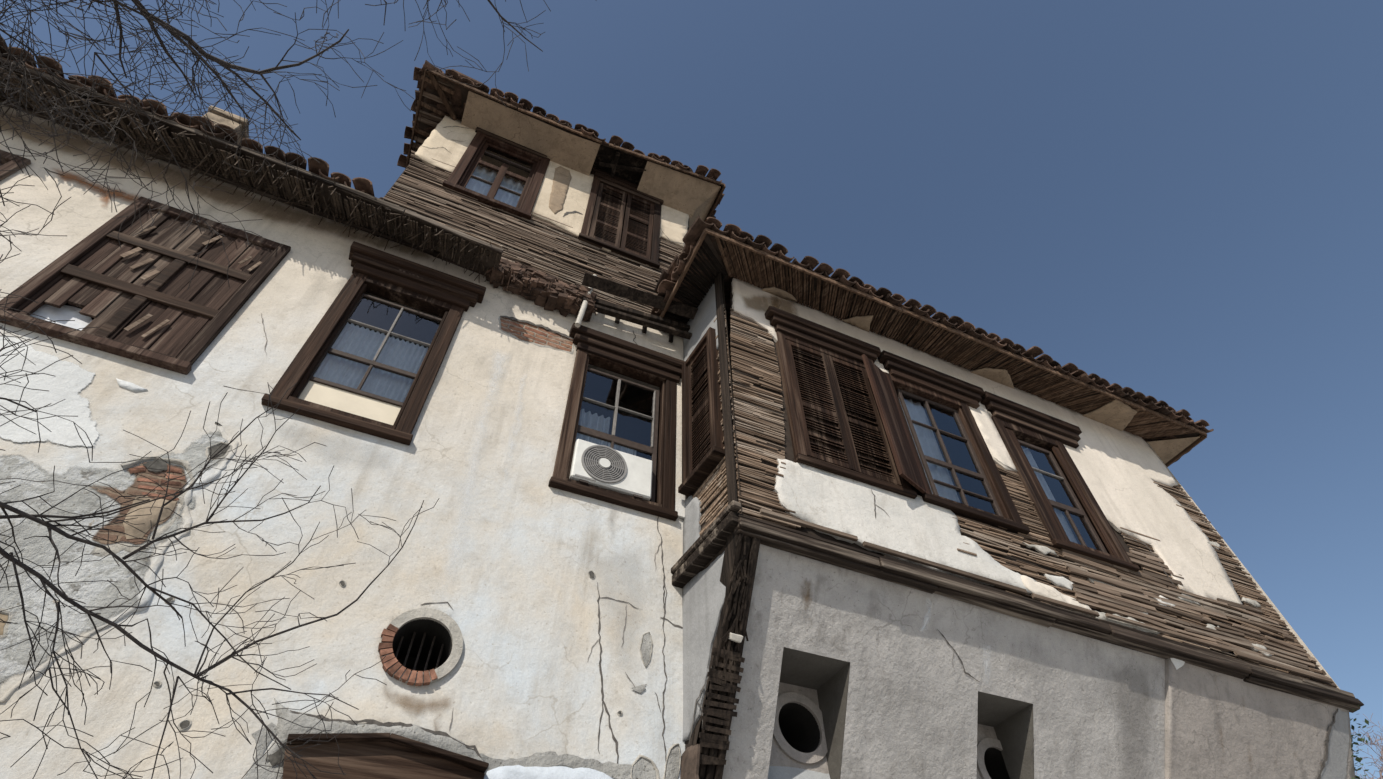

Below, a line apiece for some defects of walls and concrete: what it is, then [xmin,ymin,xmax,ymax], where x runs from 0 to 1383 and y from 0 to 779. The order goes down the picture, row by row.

flaking render [0,422,238,703]
crack [588,516,712,777]
spalling [177,720,192,731]
flaking render [243,698,633,779]
spalling [663,743,681,779]
crack [1317,710,1338,779]